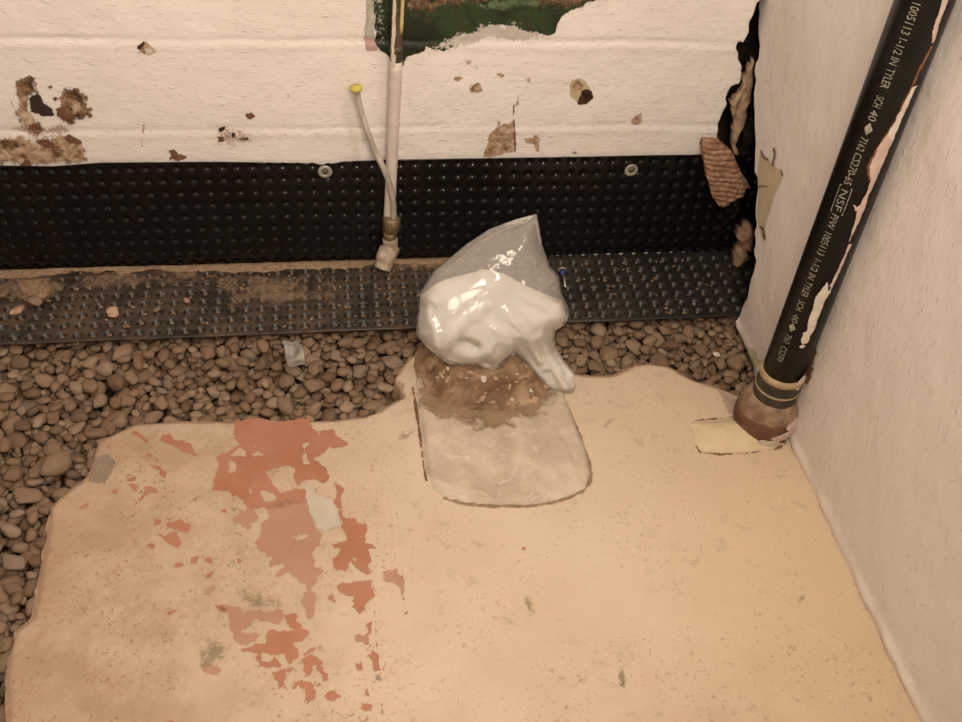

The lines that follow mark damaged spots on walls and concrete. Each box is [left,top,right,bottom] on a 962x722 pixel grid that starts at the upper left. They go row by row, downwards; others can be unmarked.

peeling [363,0,607,67]
spalling [570,79,593,105]
peeling [483,105,540,158]
peeling [757,148,783,241]
peeling [160,434,197,456]
peeling [111,476,157,506]
peeling [147,517,191,549]
peeling [174,556,215,595]
peeling [212,417,408,704]